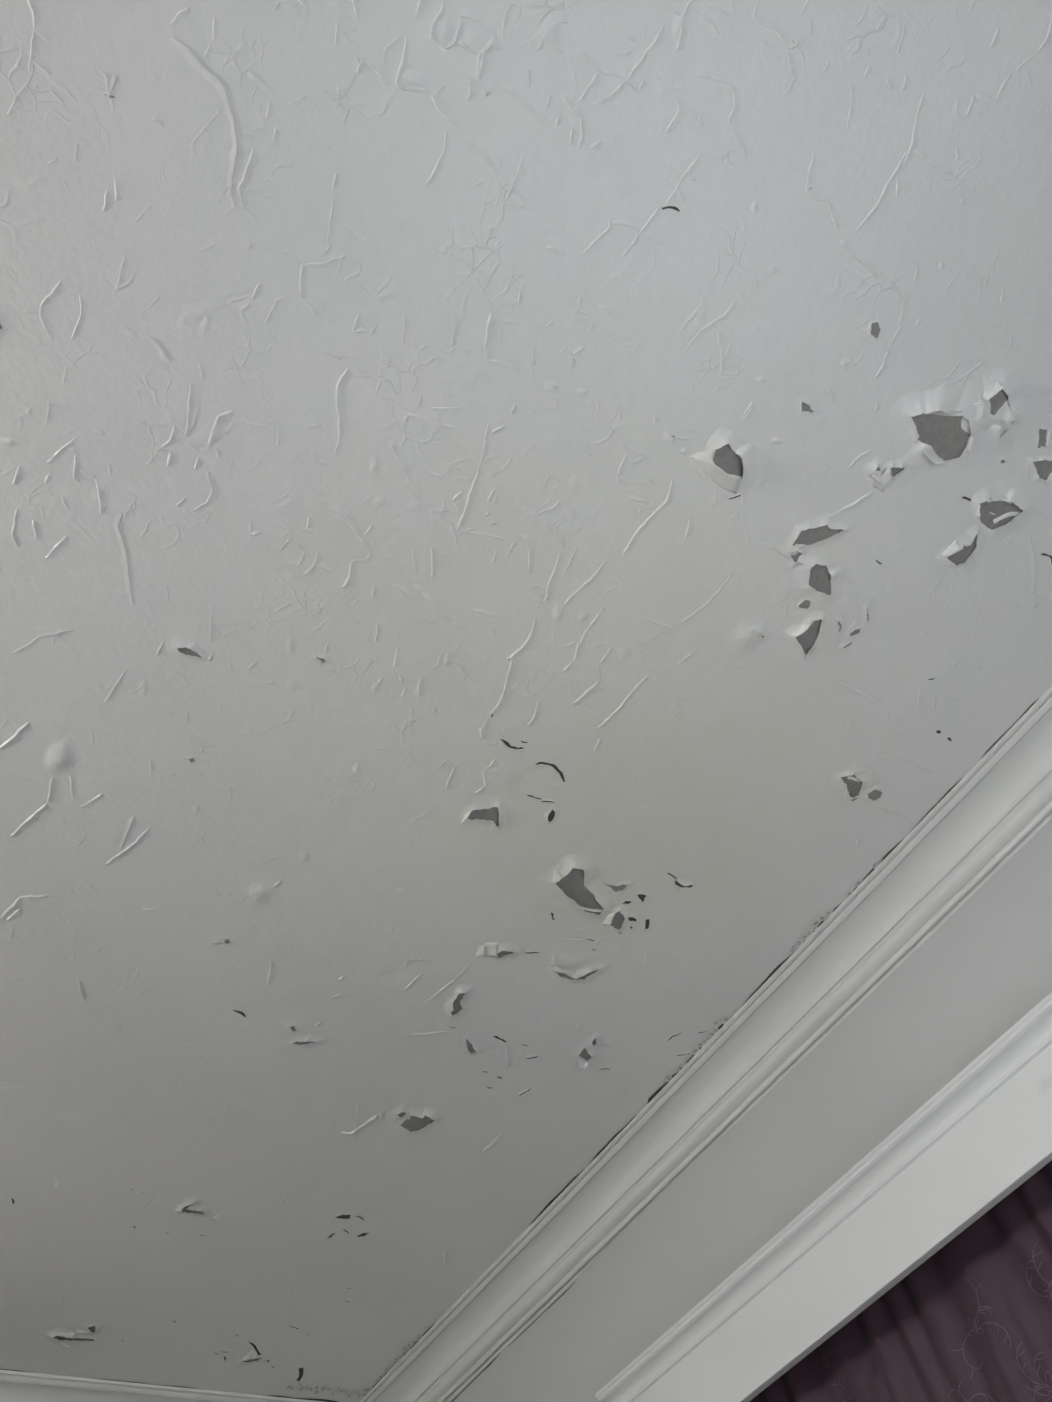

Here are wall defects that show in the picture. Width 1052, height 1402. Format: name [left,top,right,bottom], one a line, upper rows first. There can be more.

peeling [690,428,757,504]
peeling [863,365,1052,575]
peeling [778,512,876,659]
peeling [830,765,887,804]
peeling [535,854,657,936]
peeling [405,941,611,1057]
peeling [386,1103,443,1138]
peeling [175,1196,223,1222]
peeling [42,1319,110,1348]